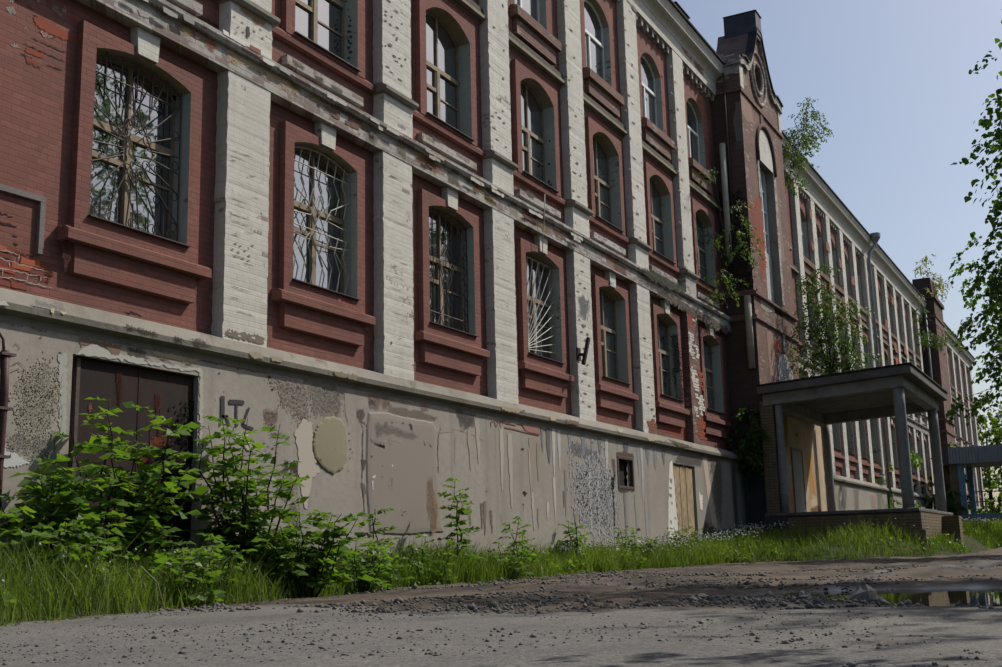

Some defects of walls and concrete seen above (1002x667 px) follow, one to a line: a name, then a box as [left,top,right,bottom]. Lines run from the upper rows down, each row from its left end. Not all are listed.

spalling [24,2,75,42]
flaking render [234,15,264,60]
flaking render [320,98,368,131]
flaking render [0,244,54,291]
leakage [5,425,63,470]
leakage [499,427,513,508]
leakage [528,426,739,539]